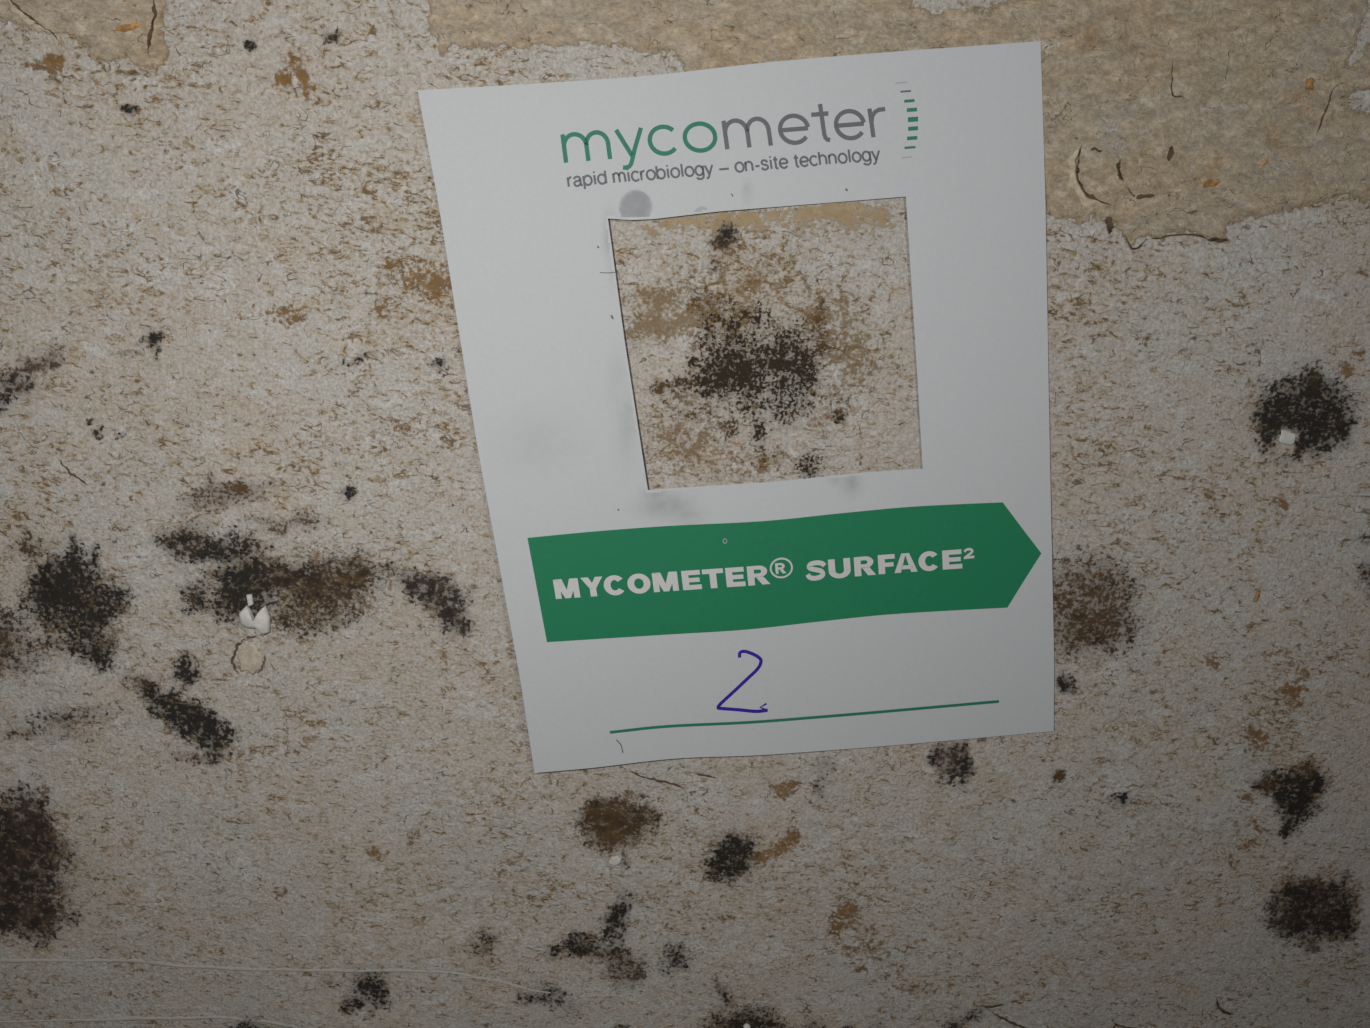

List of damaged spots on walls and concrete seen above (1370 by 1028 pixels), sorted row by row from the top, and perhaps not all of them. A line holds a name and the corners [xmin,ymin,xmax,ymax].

peeling [0,0,169,70]
peeling [427,0,1370,251]
damp [622,222,885,482]
damp [1249,360,1358,466]
damp [0,531,234,767]
damp [154,472,473,639]
damp [1052,545,1144,694]
damp [0,780,82,950]
damp [568,790,666,870]
damp [700,833,761,886]
damp [1251,760,1332,844]
damp [544,893,695,987]